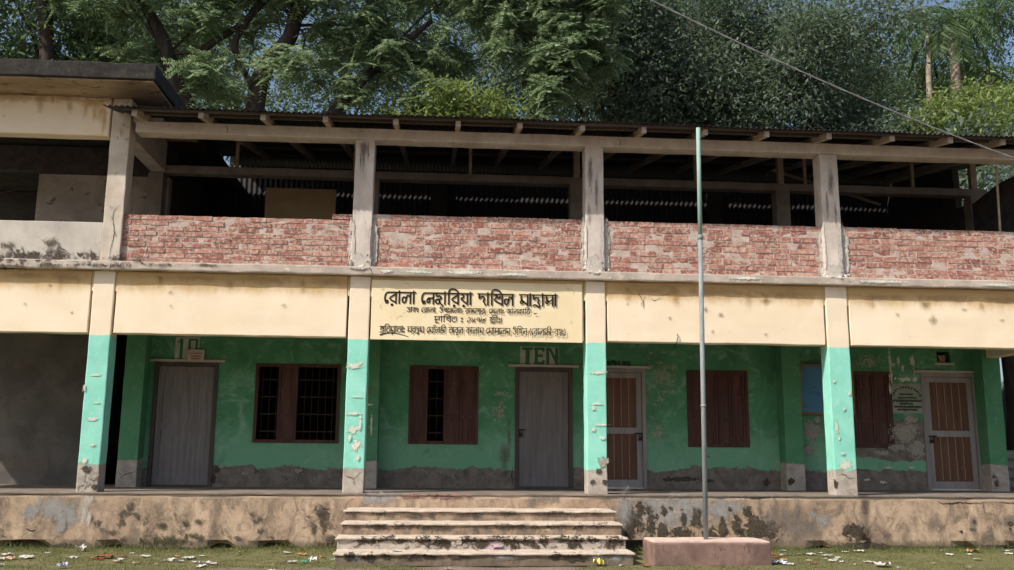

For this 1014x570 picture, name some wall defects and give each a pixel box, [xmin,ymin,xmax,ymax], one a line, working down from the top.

mould [0,237,171,270]
peeling [346,396,373,461]
peeling [873,414,926,469]
leakage [82,494,203,547]